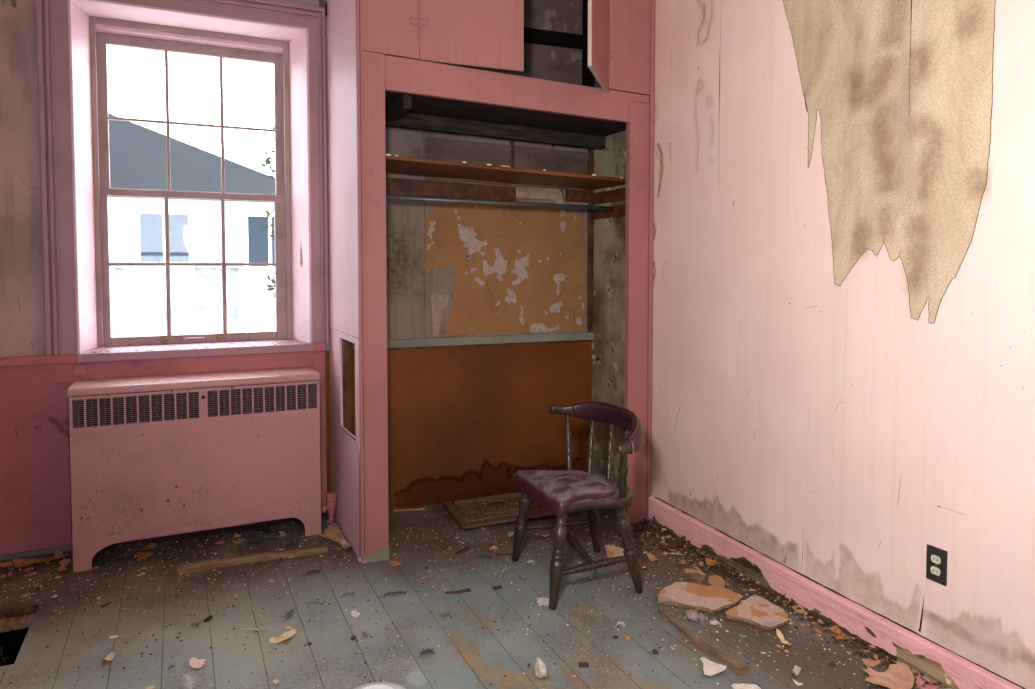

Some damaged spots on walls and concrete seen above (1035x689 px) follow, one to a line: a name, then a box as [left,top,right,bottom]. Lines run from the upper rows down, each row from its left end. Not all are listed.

peeling [783,0,996,323]
peeling [424,198,586,335]
peeling [647,516,973,689]